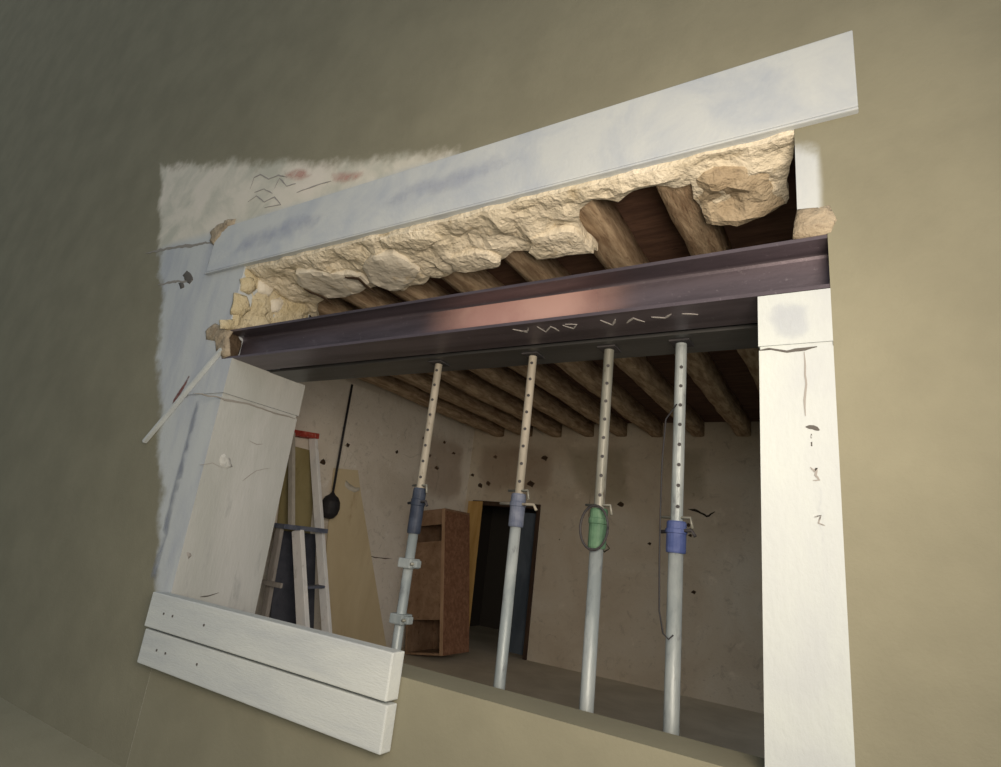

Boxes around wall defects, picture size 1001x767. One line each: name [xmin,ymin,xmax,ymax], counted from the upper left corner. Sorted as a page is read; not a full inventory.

spalling [246,130,795,317]
spalling [793,205,837,240]
crack [759,346,817,416]
crack [810,467,820,481]